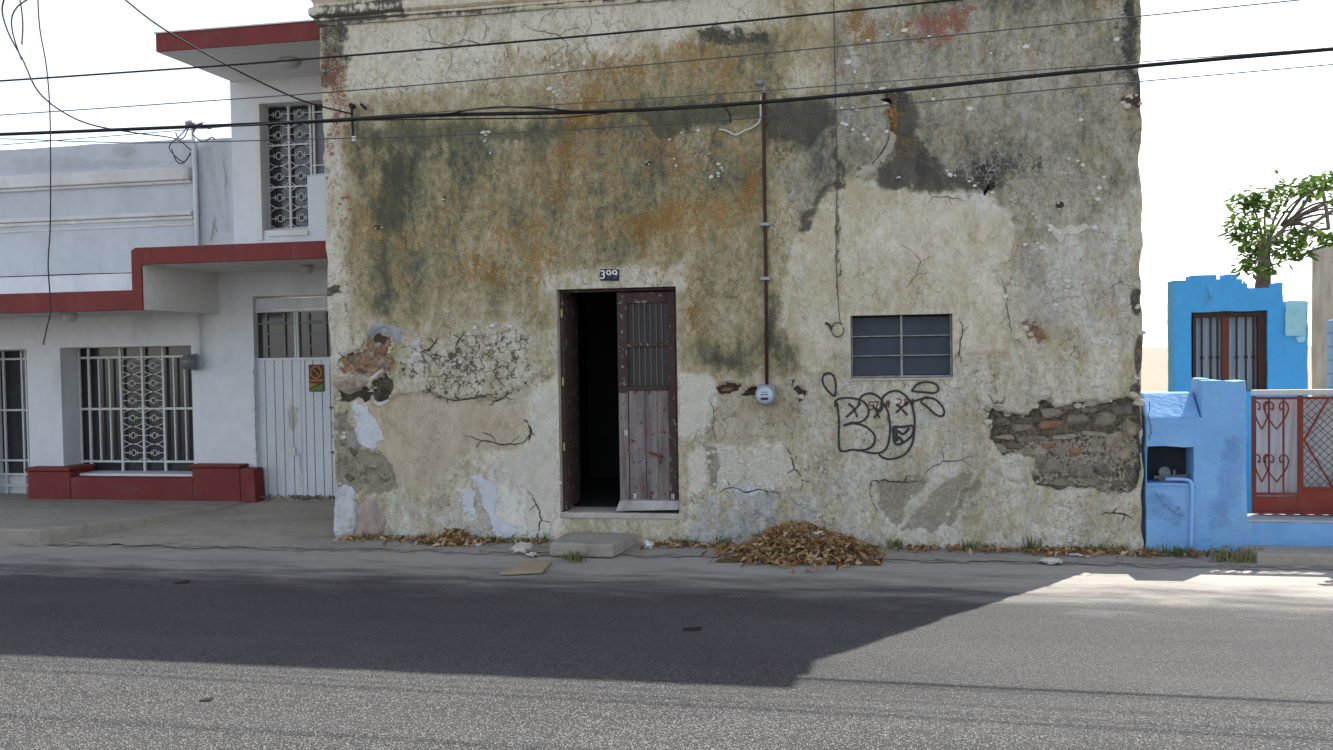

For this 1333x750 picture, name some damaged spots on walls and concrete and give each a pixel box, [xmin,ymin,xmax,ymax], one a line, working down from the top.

leakage [320,25,352,89]
leakage [697,25,770,47]
leakage [1104,0,1141,105]
leakage [609,97,845,231]
leakage [878,84,1018,193]
crack [419,332,466,356]
peeling [333,322,562,539]
crack [437,390,535,448]
flaking render [983,288,1146,495]